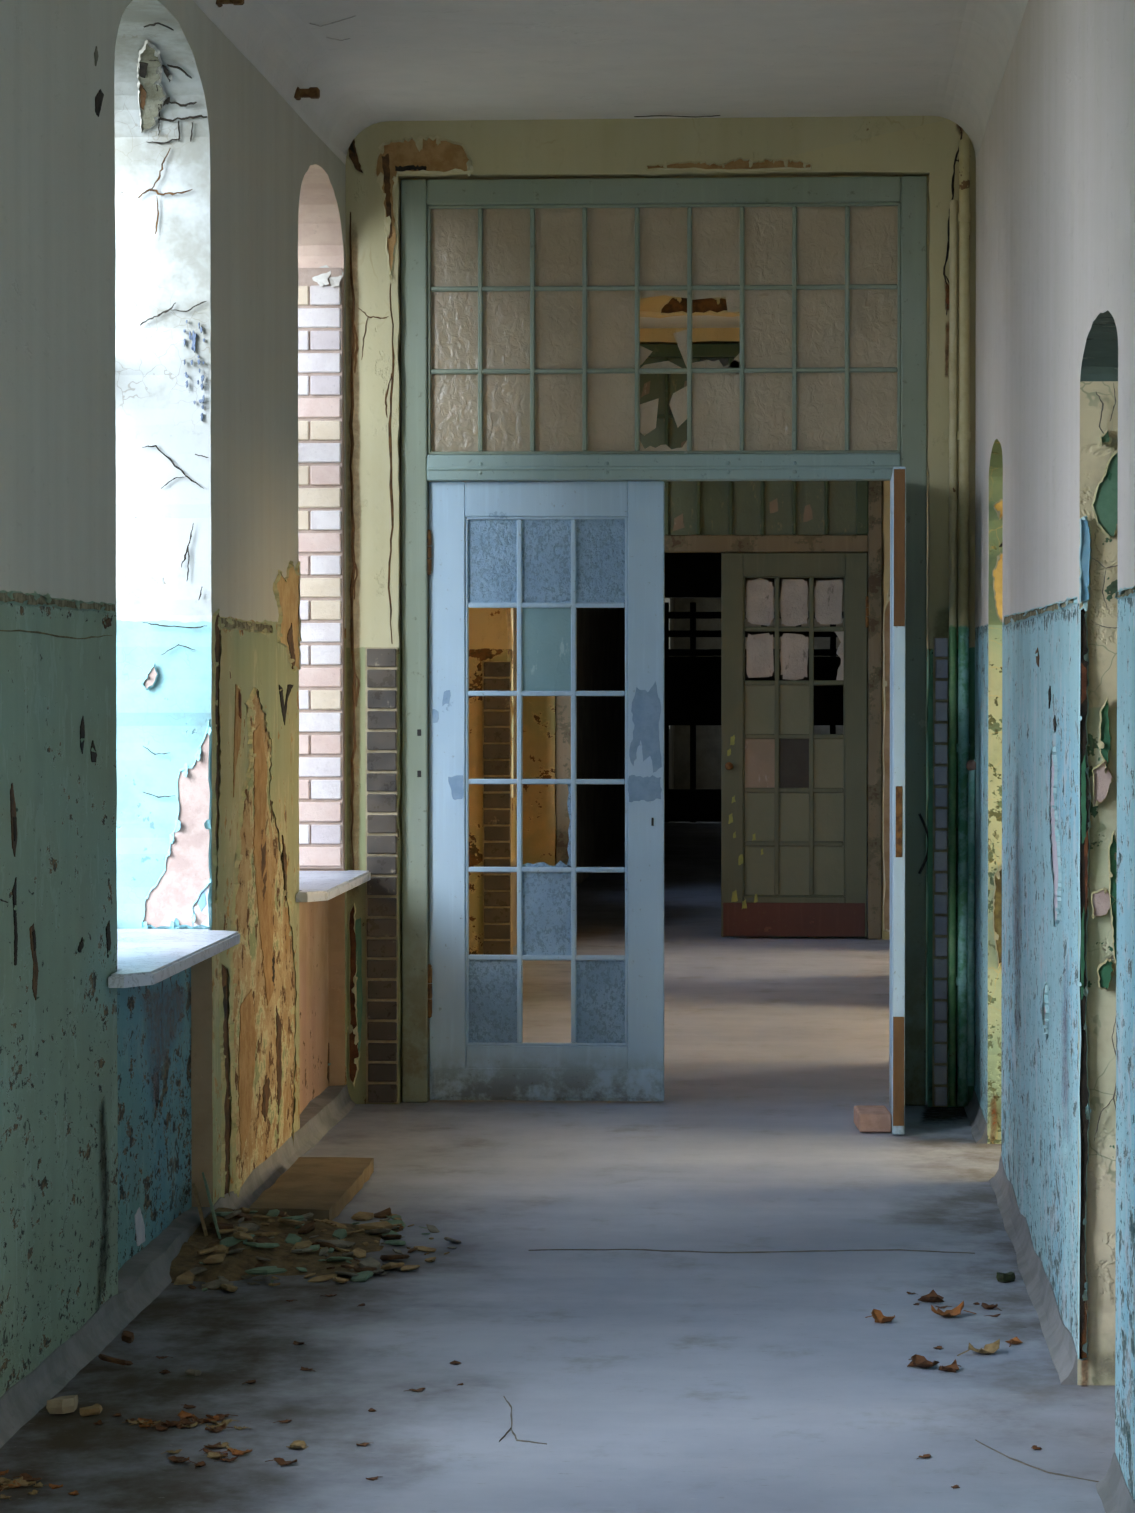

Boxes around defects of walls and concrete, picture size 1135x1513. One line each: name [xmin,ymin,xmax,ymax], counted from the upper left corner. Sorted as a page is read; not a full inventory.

crack [138,22,207,234]
spalling [348,135,474,284]
crack [140,301,206,326]
crack [142,445,209,489]
peeling [0,590,116,629]
crack [143,523,203,655]
flaking render [140,265,344,1198]
peeling [10,783,18,857]
peeling [12,877,40,1000]
peeling [327,903,363,1086]
peeling [992,553,1115,1360]
crack [499,1396,547,1445]